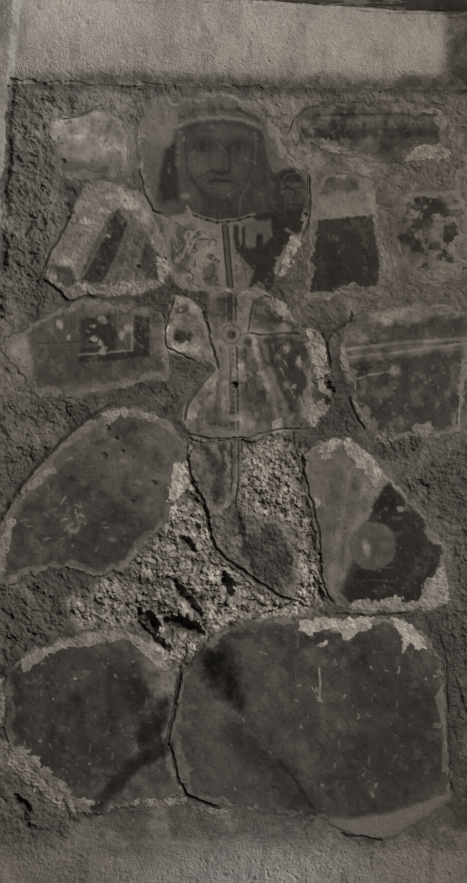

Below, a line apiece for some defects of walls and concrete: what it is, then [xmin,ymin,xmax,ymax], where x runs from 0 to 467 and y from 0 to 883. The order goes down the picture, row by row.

peeling [279,235,302,277]
peeling [271,296,291,320]
peeling [306,325,335,427]
peeling [339,344,350,373]
peeling [100,407,159,429]
crack [164,302,403,619]
peeling [0,517,17,578]
spalling [19,418,450,673]
crack [165,646,219,809]